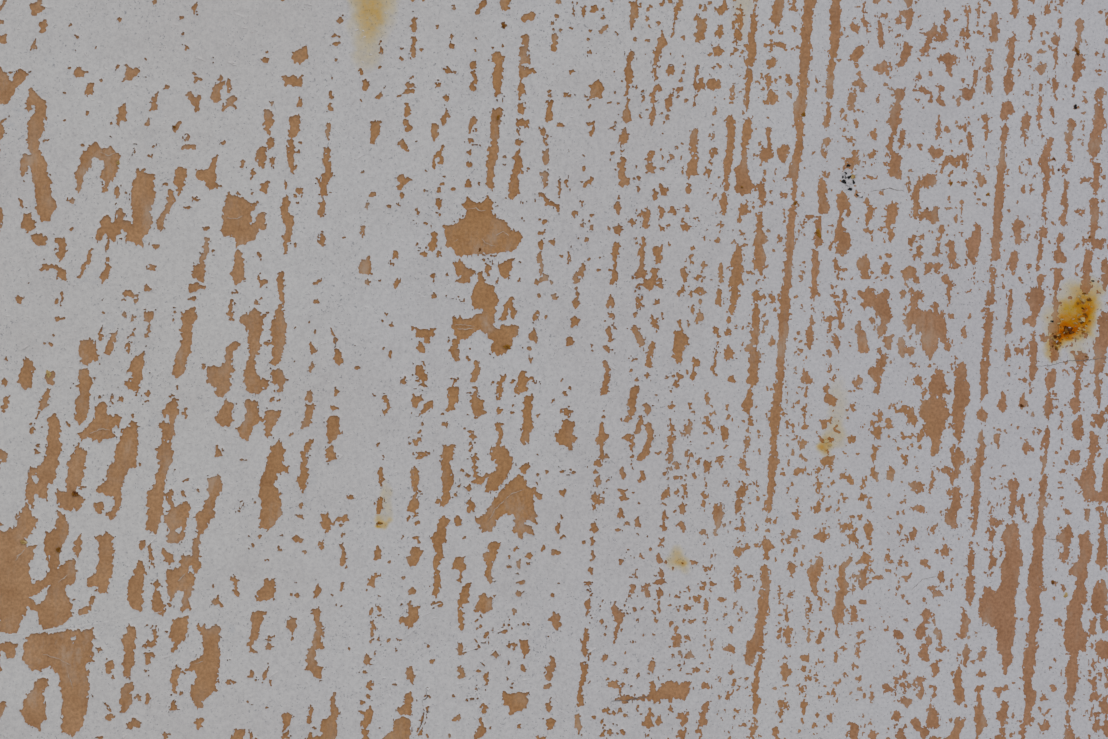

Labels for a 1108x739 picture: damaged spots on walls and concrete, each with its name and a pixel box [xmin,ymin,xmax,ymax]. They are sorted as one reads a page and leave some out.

peeling [0,0,11,48]
peeling [26,0,51,54]
peeling [176,0,202,54]
rust [1049,292,1093,351]
peeling [0,11,364,739]
peeling [339,0,1108,739]